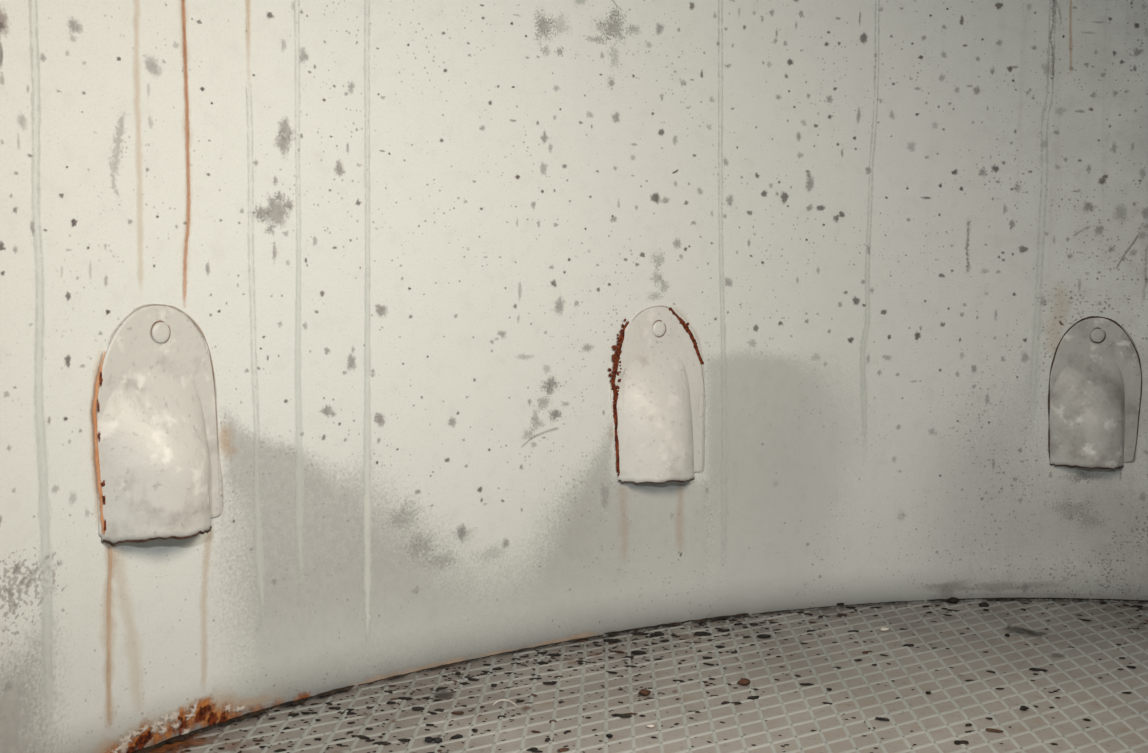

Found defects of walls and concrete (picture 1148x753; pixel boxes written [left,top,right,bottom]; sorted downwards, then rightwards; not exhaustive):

corrosion [182,0,190,226]
corrosion [93,352,106,533]
corrosion [608,319,629,476]
corrosion [669,307,704,364]
corrosion [111,698,229,753]